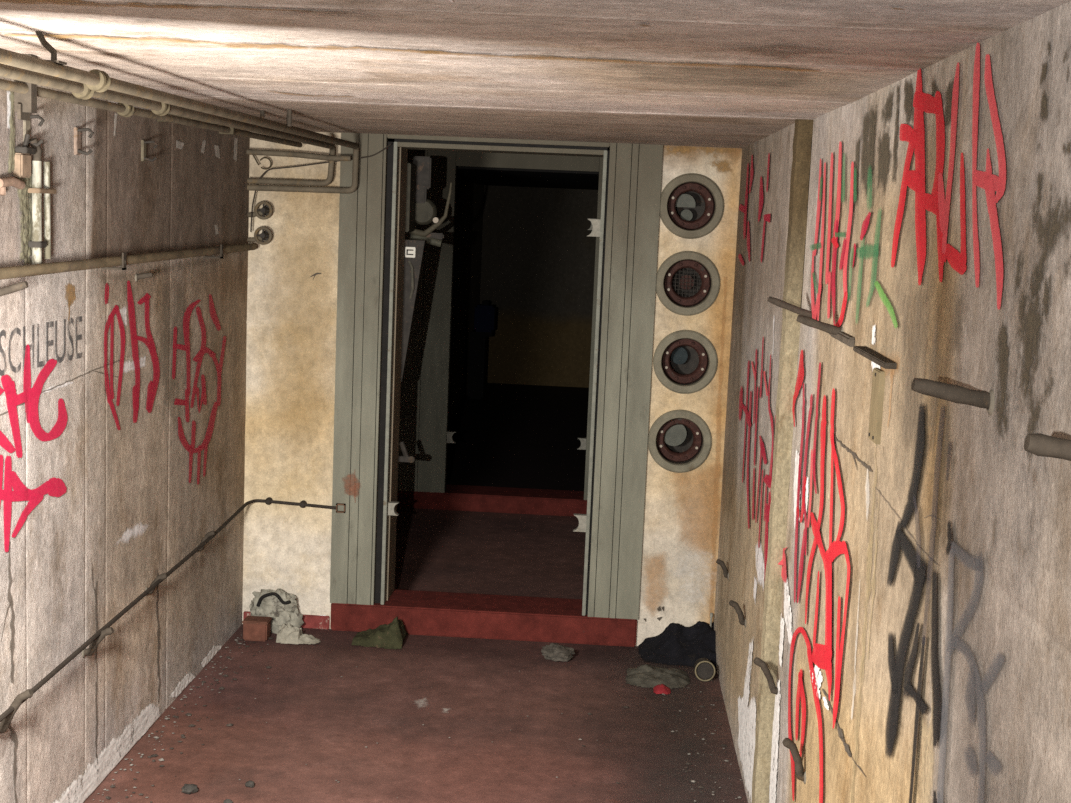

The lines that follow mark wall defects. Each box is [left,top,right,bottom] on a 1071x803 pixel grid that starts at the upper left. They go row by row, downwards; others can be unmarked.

damp [1040,43,1050,120]
damp [996,174,1071,435]
crack [0,360,120,416]